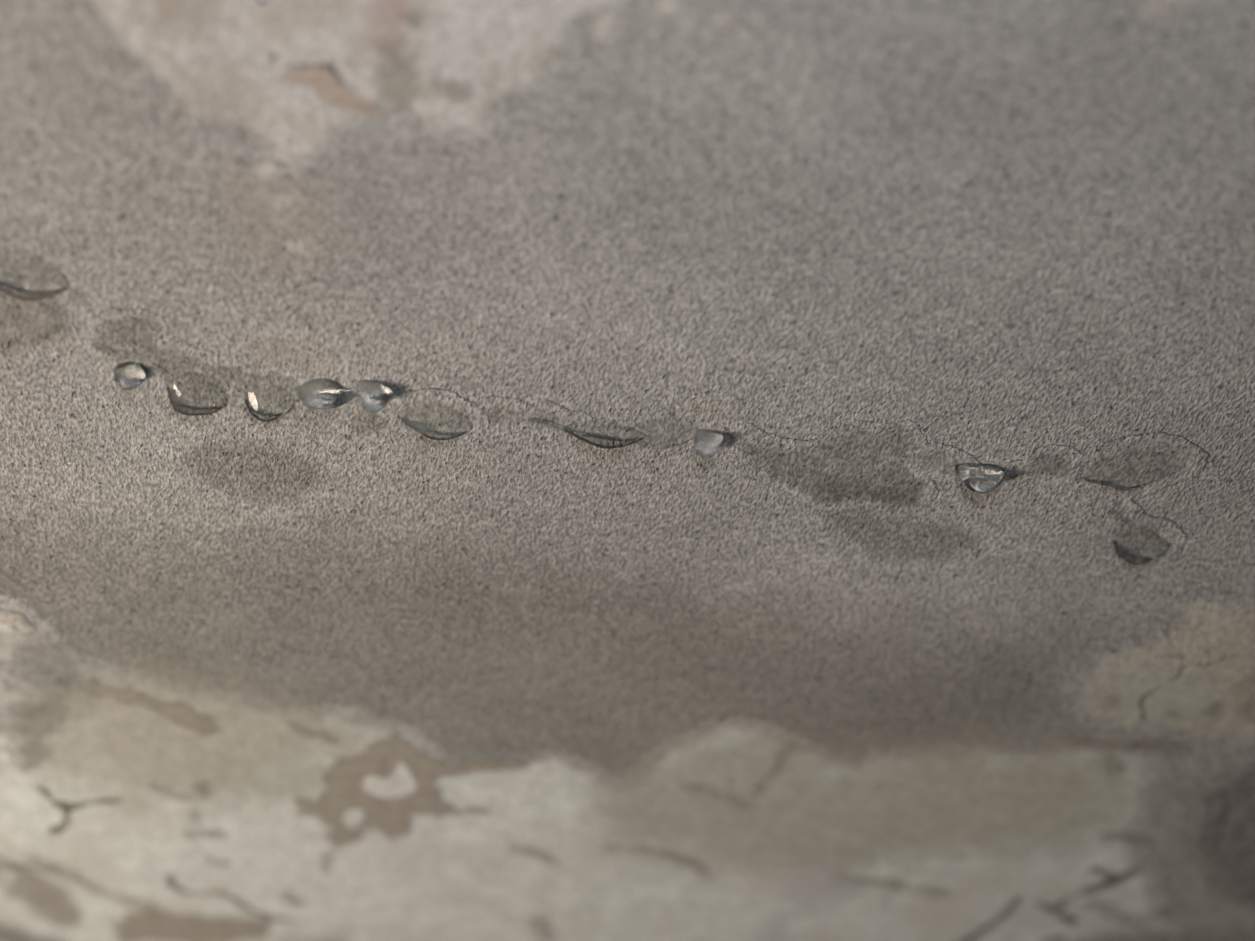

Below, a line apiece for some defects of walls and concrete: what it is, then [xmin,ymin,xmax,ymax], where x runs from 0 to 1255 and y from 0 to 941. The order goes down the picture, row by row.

leakage [0,131,1208,864]
peeling [87,682,219,735]
crack [39,788,120,834]
peeling [295,734,525,846]
spalling [1153,751,1255,920]
peeling [114,907,273,941]
crack [166,876,290,921]
crack [963,868,1141,941]